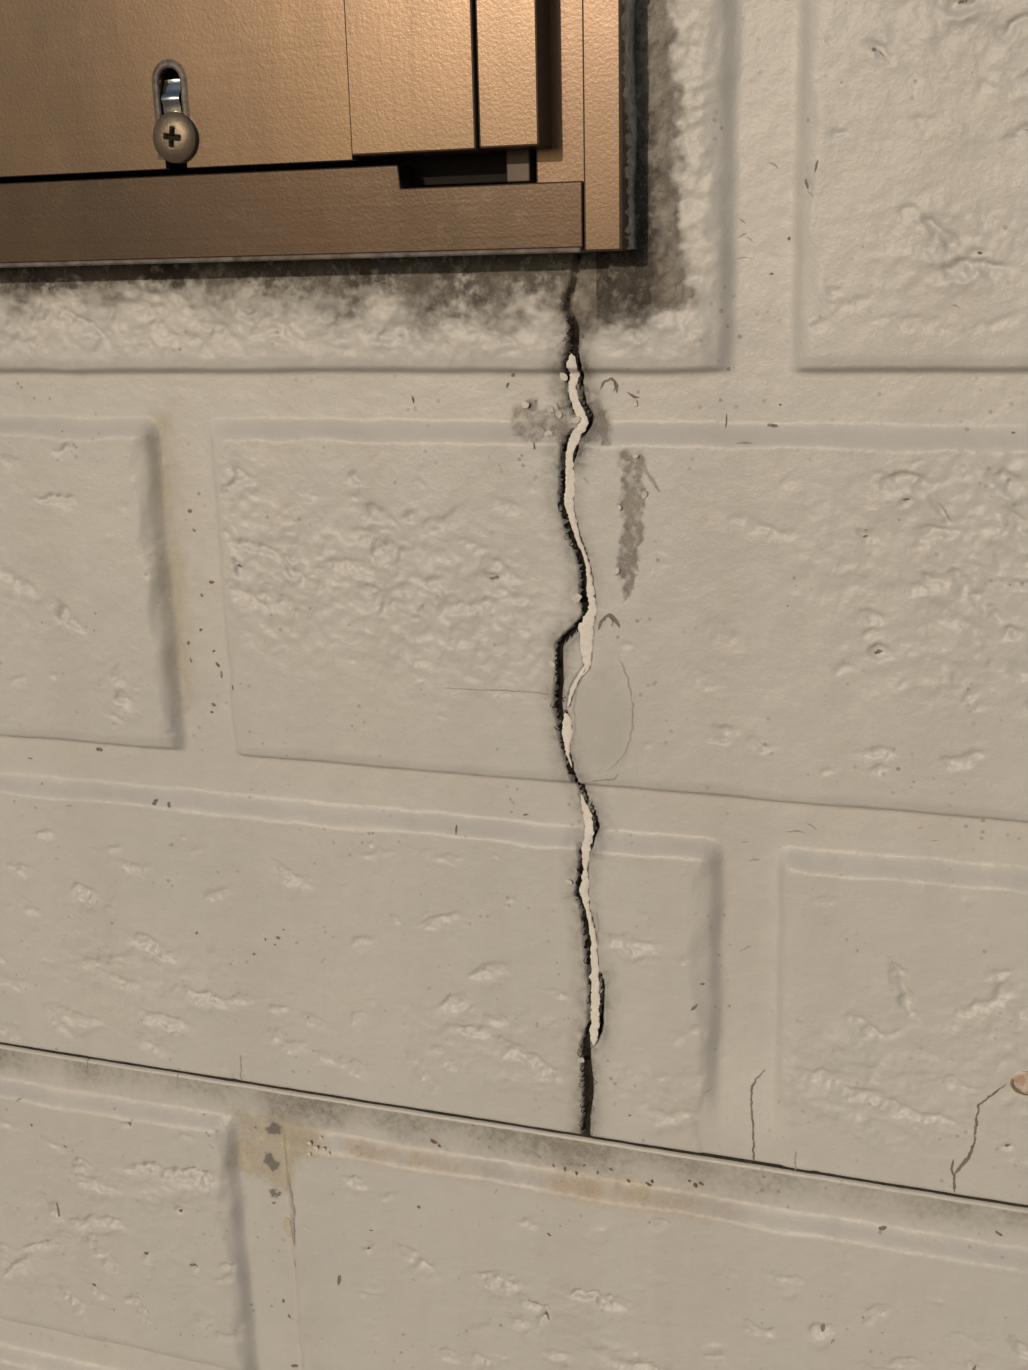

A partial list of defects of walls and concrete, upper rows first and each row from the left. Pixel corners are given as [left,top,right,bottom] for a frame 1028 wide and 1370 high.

leakage [0,229,646,310]
crack [448,253,619,1134]